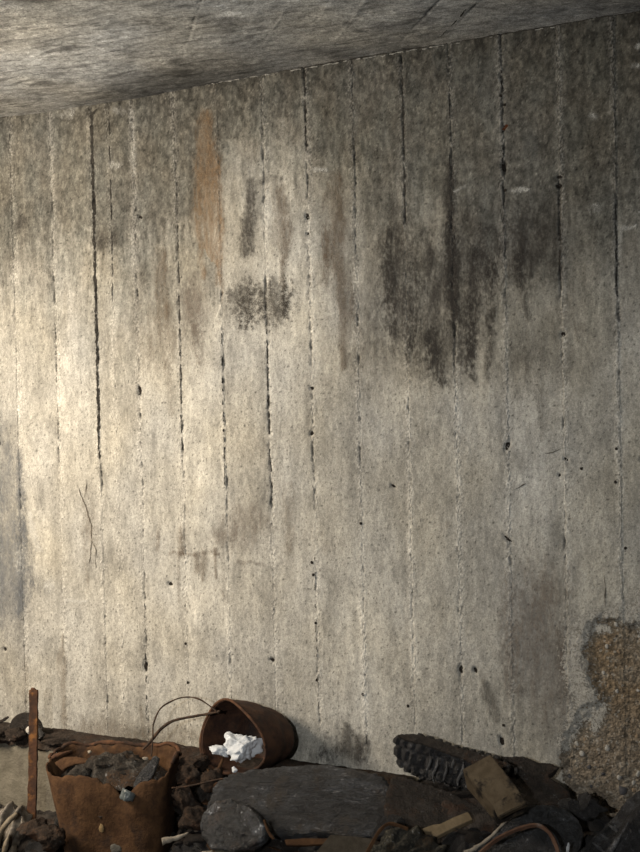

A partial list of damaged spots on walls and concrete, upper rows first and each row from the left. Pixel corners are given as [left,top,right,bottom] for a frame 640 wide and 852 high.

leakage [445,164,459,320]
leakage [466,304,475,381]
spalling [553,588,640,818]